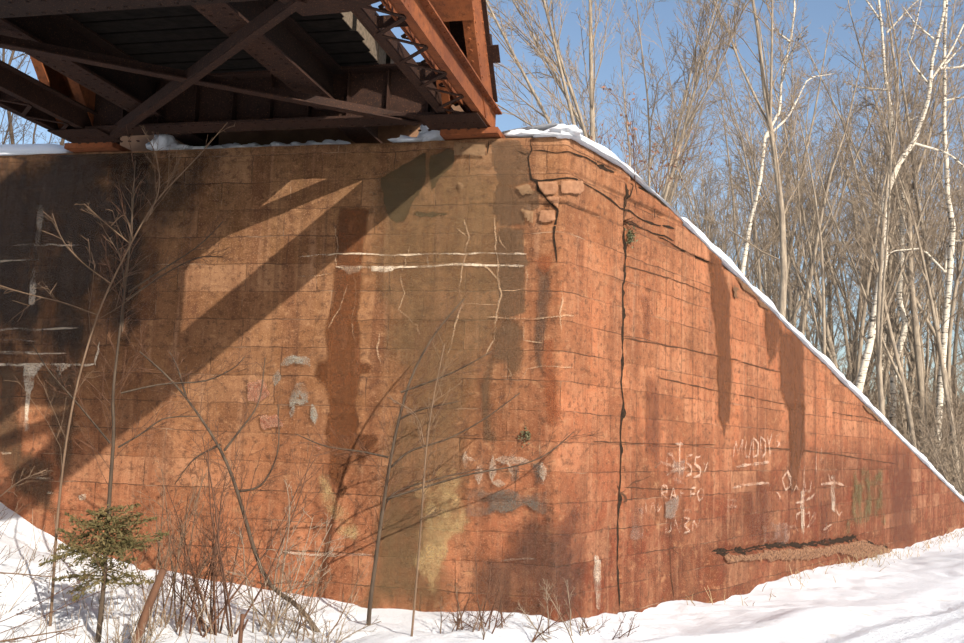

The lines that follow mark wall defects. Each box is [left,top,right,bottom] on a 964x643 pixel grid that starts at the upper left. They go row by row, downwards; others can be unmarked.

spalling [454,142,486,156]
water stain [329,149,454,343]
water stain [438,140,538,440]
water stain [536,276,548,366]
spalling [516,180,584,223]
crack [518,140,784,612]
crack [765,447,897,465]
spalling [724,540,892,563]